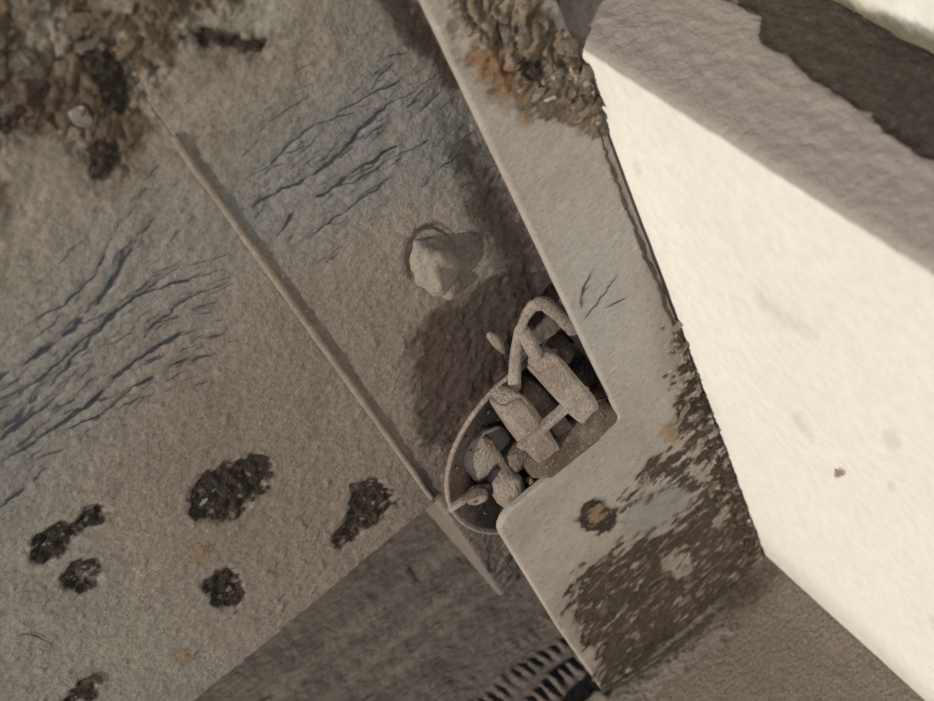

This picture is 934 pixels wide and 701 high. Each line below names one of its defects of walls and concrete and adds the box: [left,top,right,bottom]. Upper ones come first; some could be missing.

spalling [0,0,264,181]
crack [239,53,497,264]
peeling [447,0,607,140]
crack [0,163,238,519]
damp [411,272,545,446]
crack [580,273,638,320]
peeling [560,320,763,691]